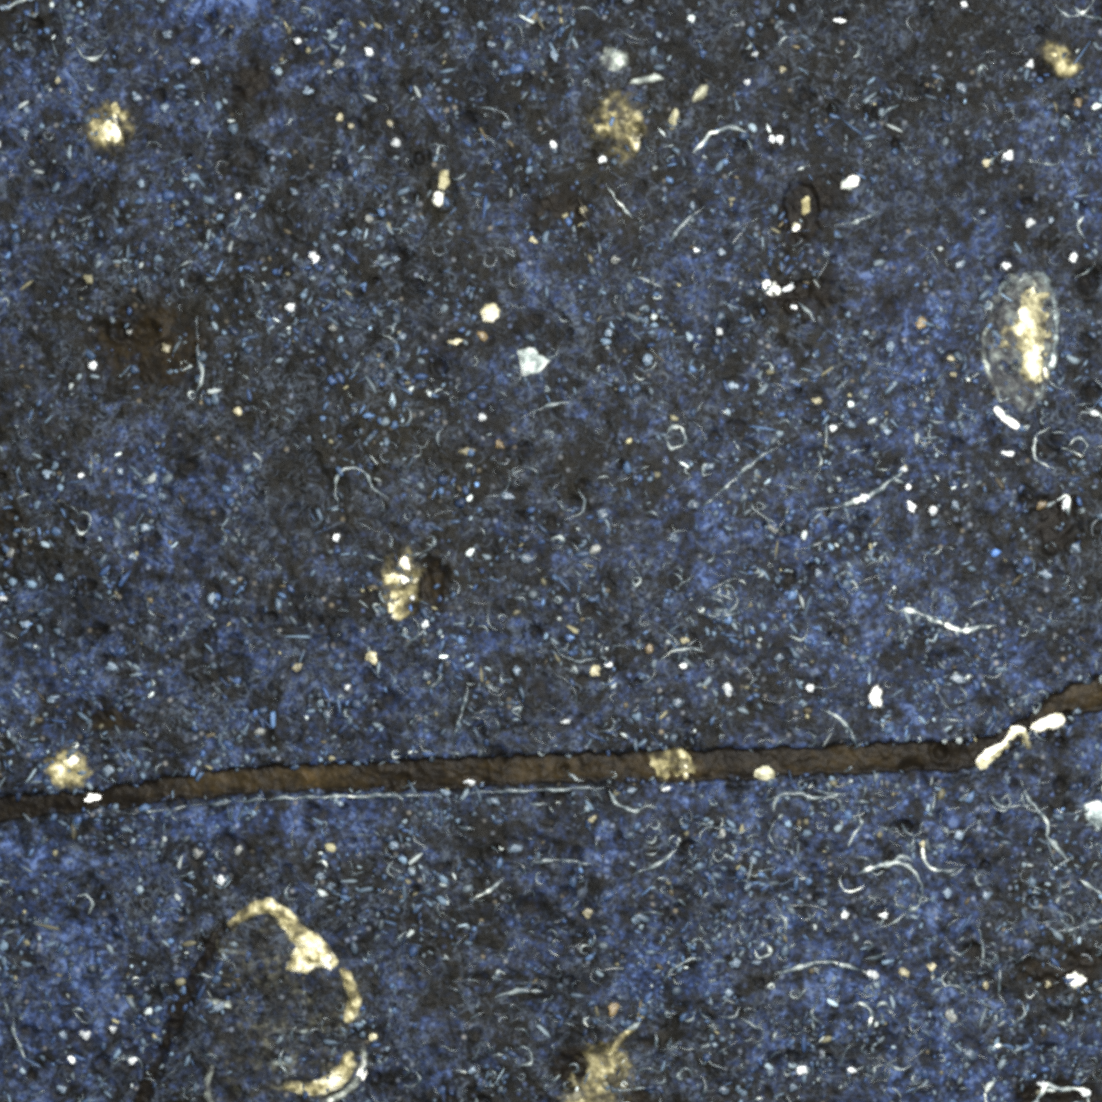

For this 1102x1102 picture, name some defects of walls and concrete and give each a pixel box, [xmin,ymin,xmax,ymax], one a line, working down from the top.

crack [0,675,1102,822]
crack [134,923,227,1102]